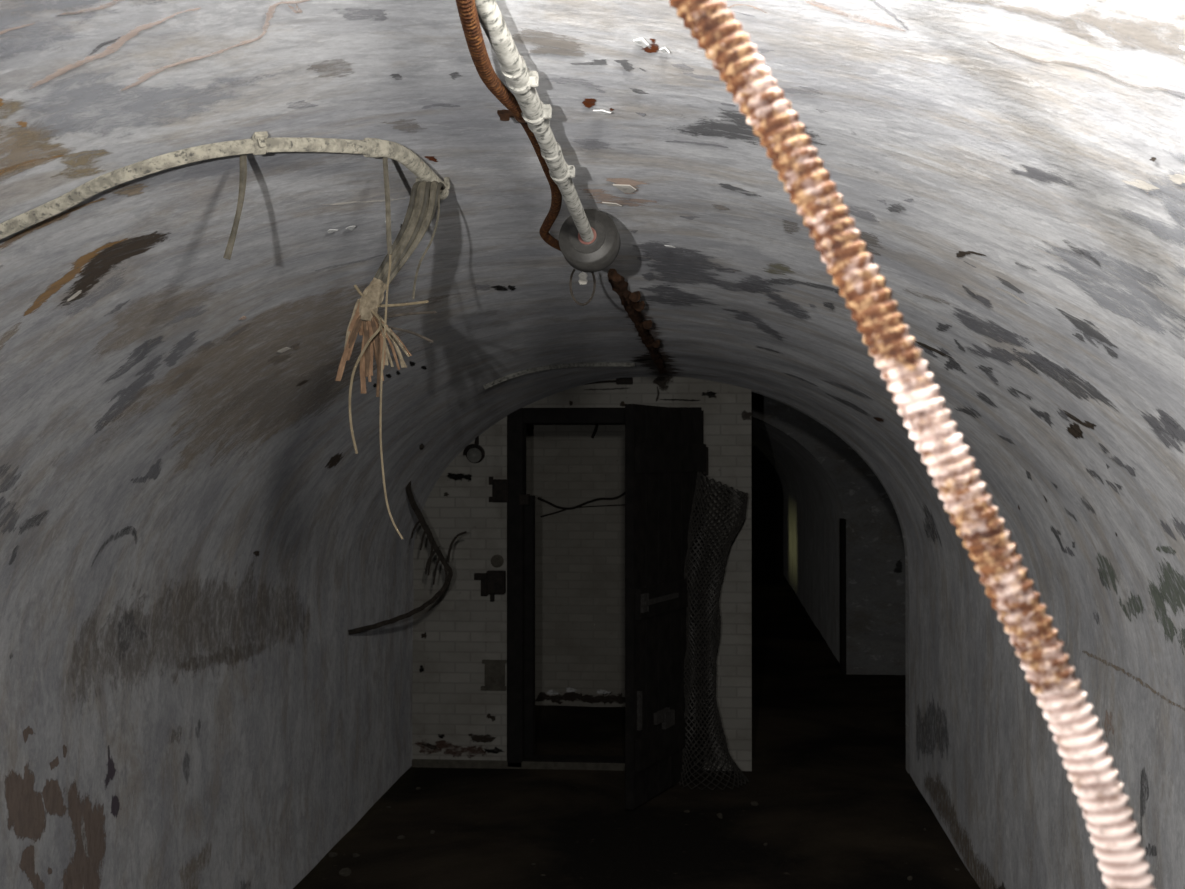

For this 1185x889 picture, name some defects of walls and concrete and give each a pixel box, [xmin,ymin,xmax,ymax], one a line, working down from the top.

spalling [590,59,645,72]
spalling [633,38,721,81]
damp [0,99,109,178]
peeling [665,103,760,148]
peeling [1010,164,1072,185]
peeling [1119,154,1185,245]
peeling [23,231,171,316]
peeling [1044,241,1185,335]
spalling [1141,409,1185,453]
peeling [1097,515,1185,655]
crack [1083,651,1183,710]
peeling [4,745,106,889]